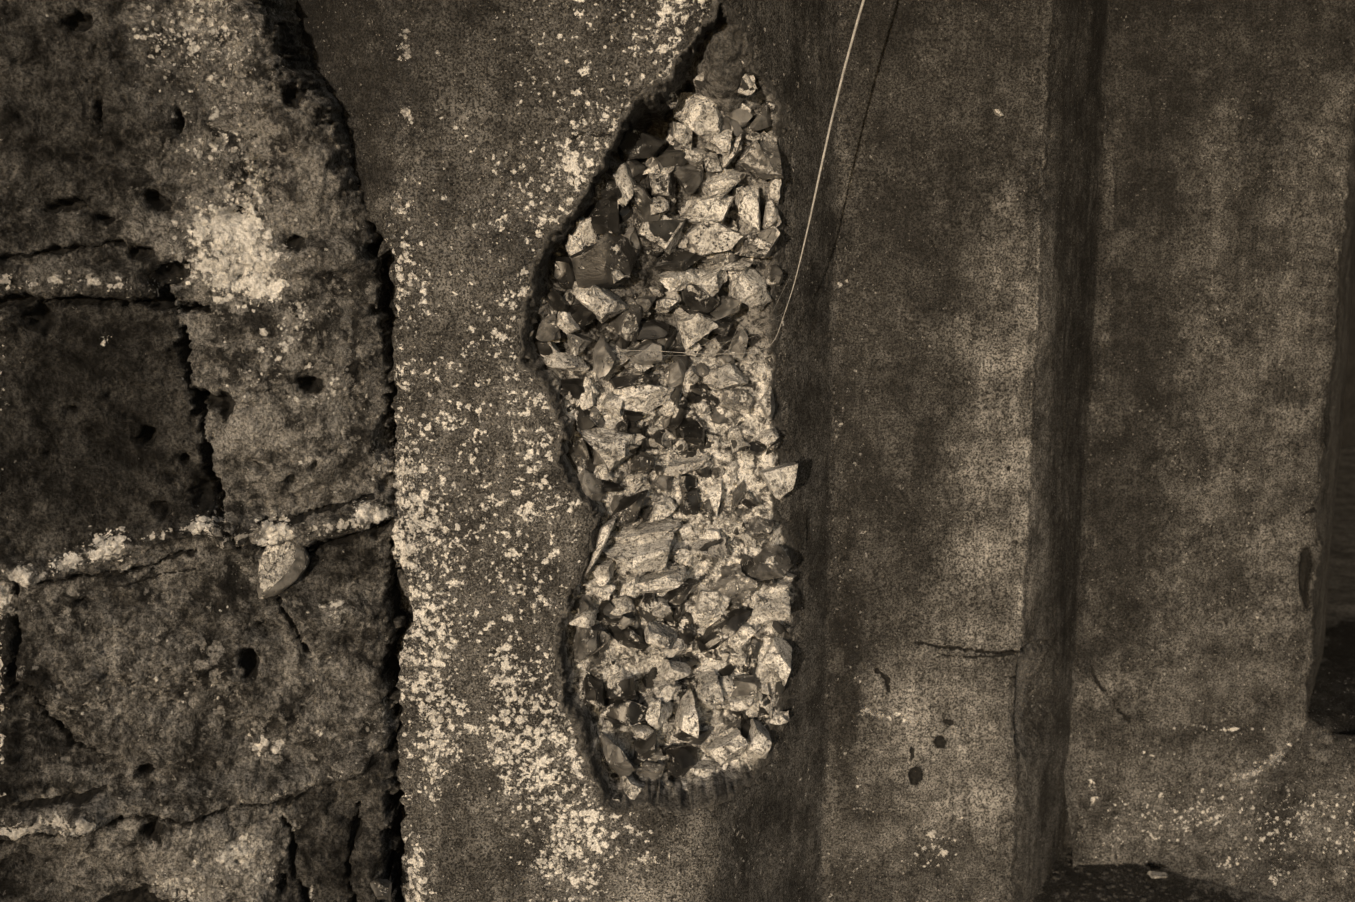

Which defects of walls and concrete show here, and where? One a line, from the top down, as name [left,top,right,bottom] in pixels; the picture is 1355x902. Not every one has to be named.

spalling [517,0,803,816]
crack [914,642,1027,679]